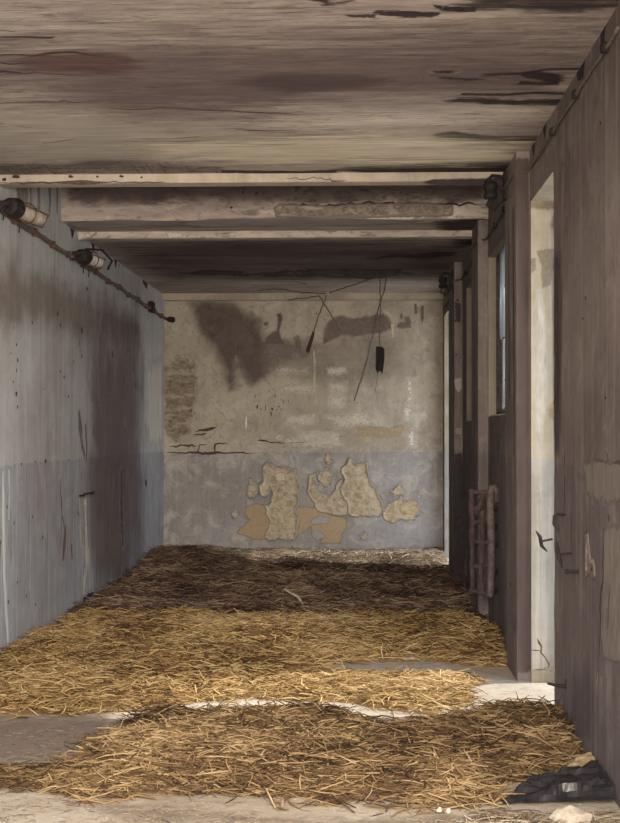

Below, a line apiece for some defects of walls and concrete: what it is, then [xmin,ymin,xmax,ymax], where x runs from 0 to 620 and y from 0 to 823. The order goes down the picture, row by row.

water stain [346,0,620,18]
water stain [324,304,424,342]
water stain [196,302,306,387]
crack [166,427,304,455]
spalling [230,453,420,544]